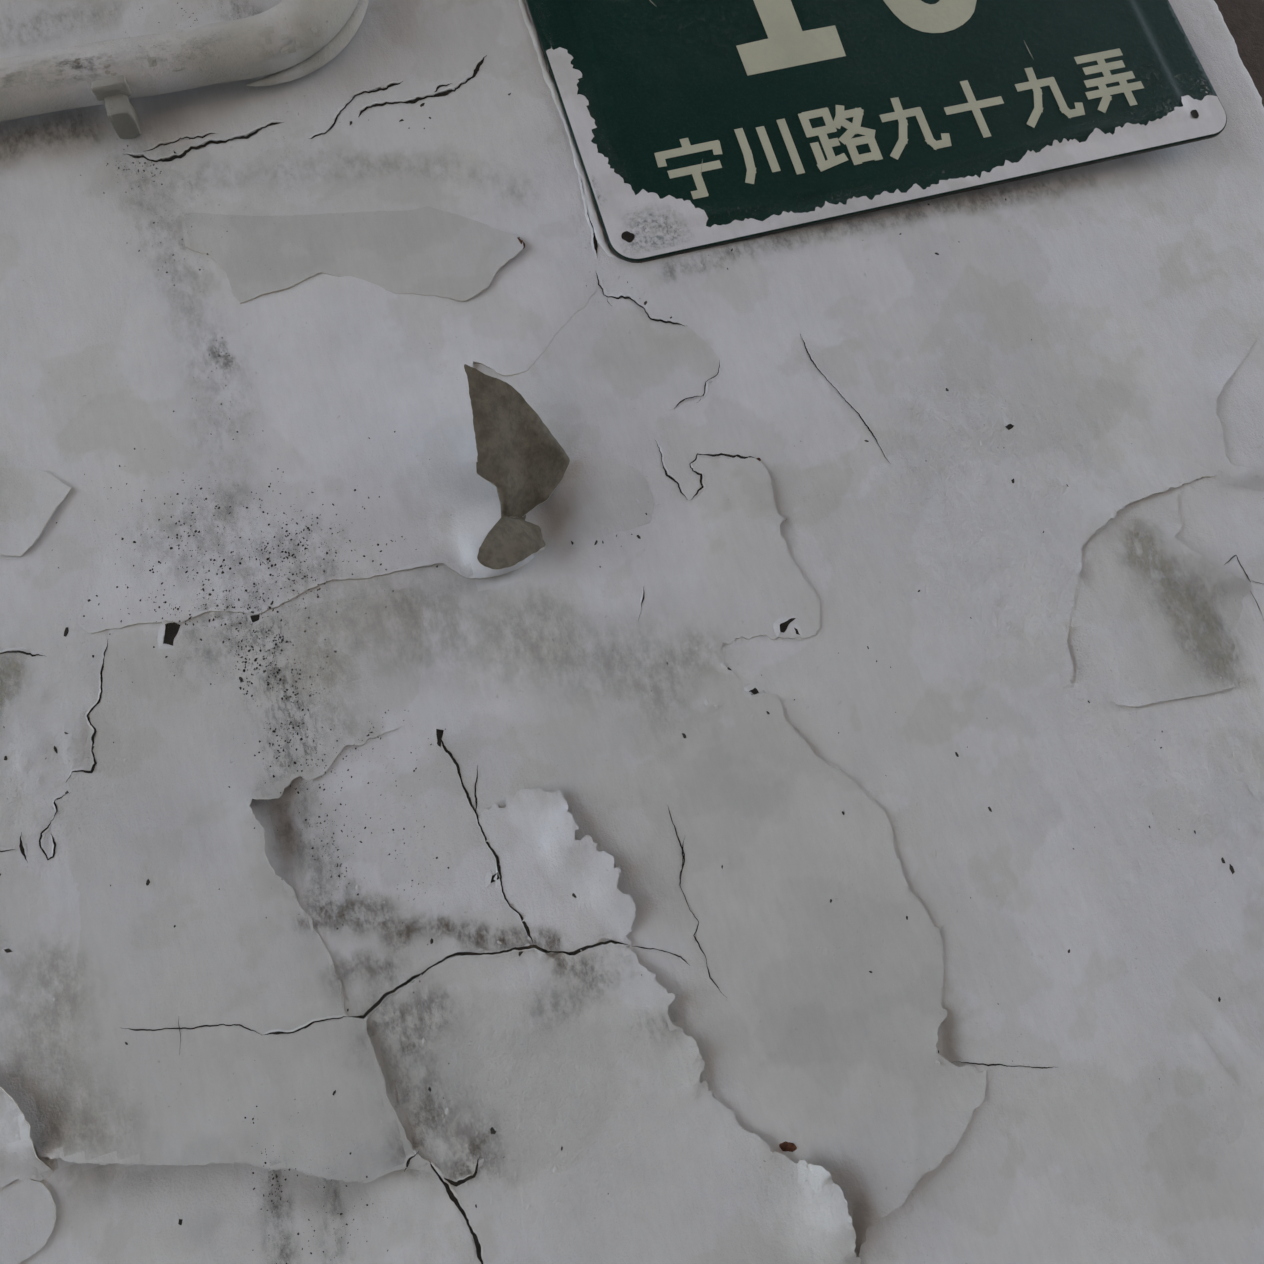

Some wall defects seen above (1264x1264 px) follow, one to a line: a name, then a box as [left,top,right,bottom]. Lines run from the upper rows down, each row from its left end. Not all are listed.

crack [124,55,487,162]
peeling [1000,229,1264,735]
peeling [0,197,987,1264]
crack [122,739,727,1055]
crack [403,1150,486,1264]